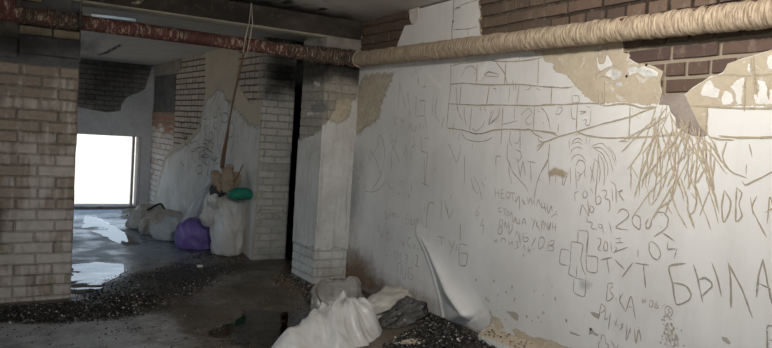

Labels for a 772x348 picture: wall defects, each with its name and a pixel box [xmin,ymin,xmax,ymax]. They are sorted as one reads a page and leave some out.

spalling [479,0,745,35]
peeling [330,73,393,135]
spalling [535,28,772,137]
peeling [486,297,568,348]
spalling [659,314,685,347]